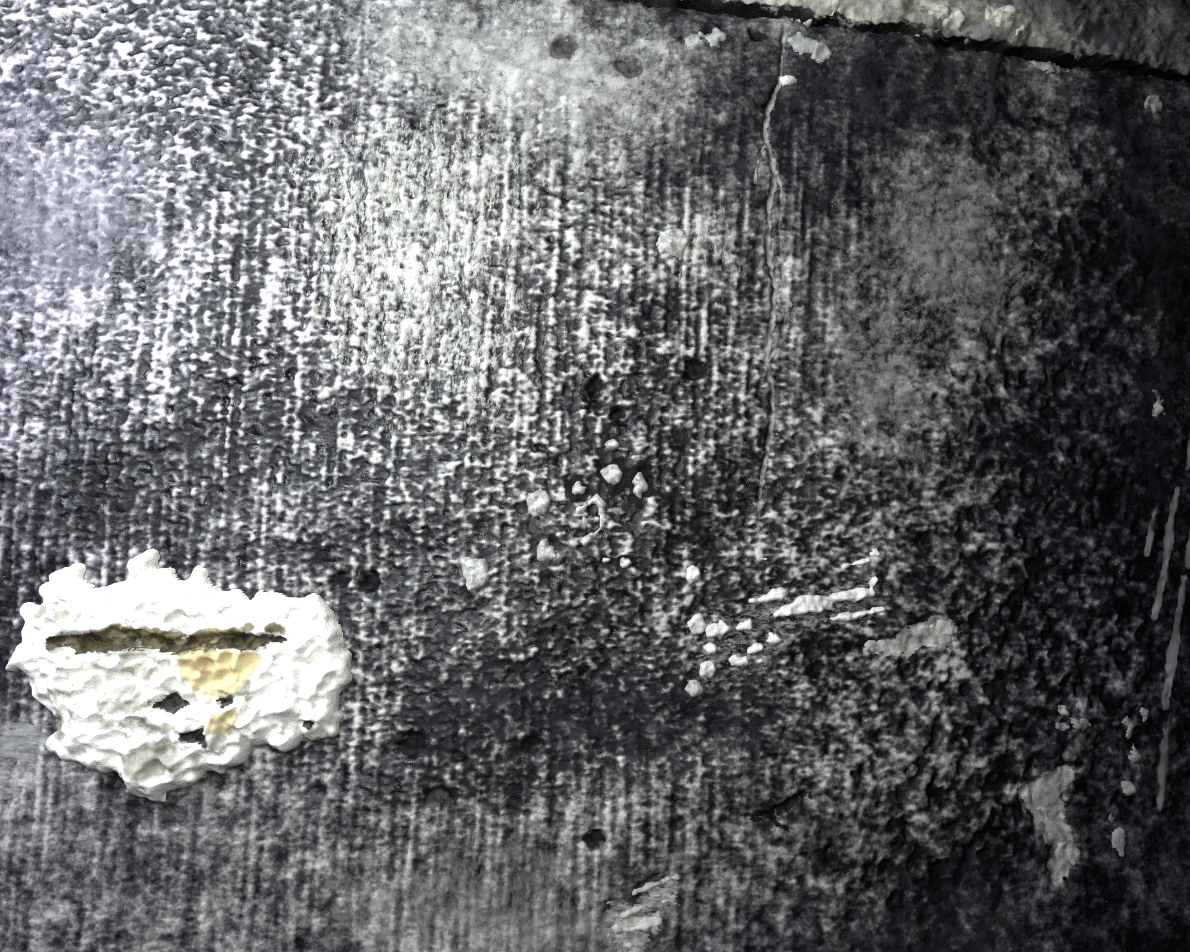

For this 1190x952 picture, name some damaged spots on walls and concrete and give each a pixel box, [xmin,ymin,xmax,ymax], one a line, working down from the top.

crack [754,29,797,535]